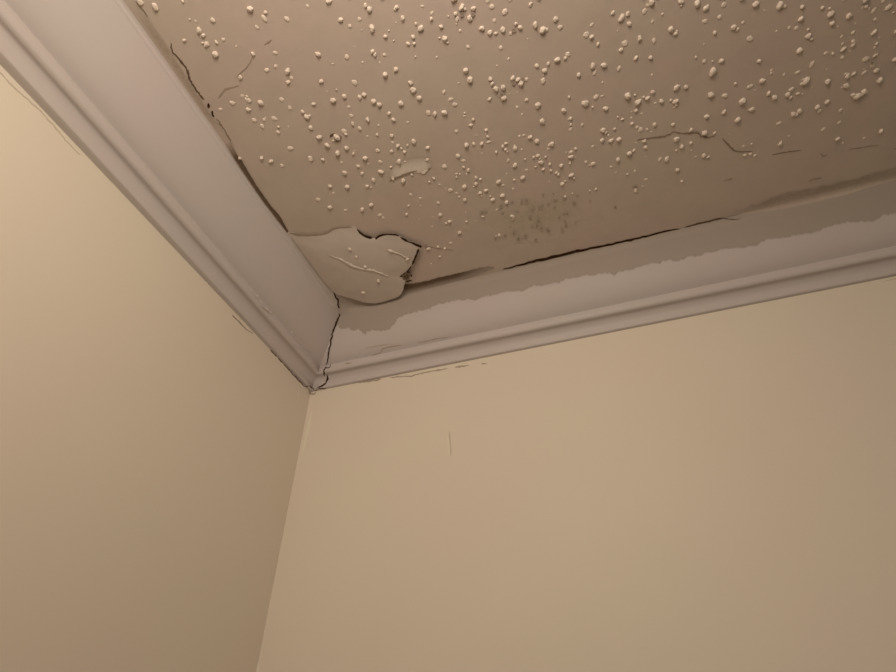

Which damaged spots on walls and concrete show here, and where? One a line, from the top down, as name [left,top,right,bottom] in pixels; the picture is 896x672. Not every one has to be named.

crack [163,39,272,141]
crack [357,229,453,282]
crack [504,218,737,269]
crack [270,292,340,391]